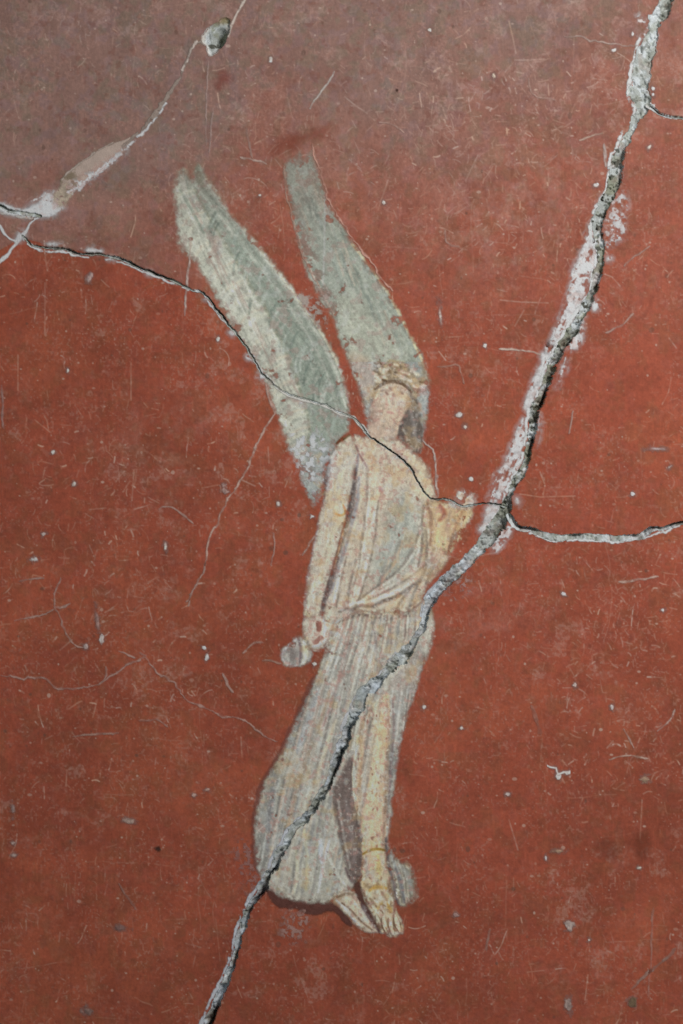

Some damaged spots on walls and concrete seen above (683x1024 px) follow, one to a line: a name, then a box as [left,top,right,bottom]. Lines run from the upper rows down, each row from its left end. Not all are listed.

flaking render [201,17,231,56]
crack [0,40,502,507]
crack [199,0,683,1024]
crack [24,578,84,648]
crack [9,658,276,742]